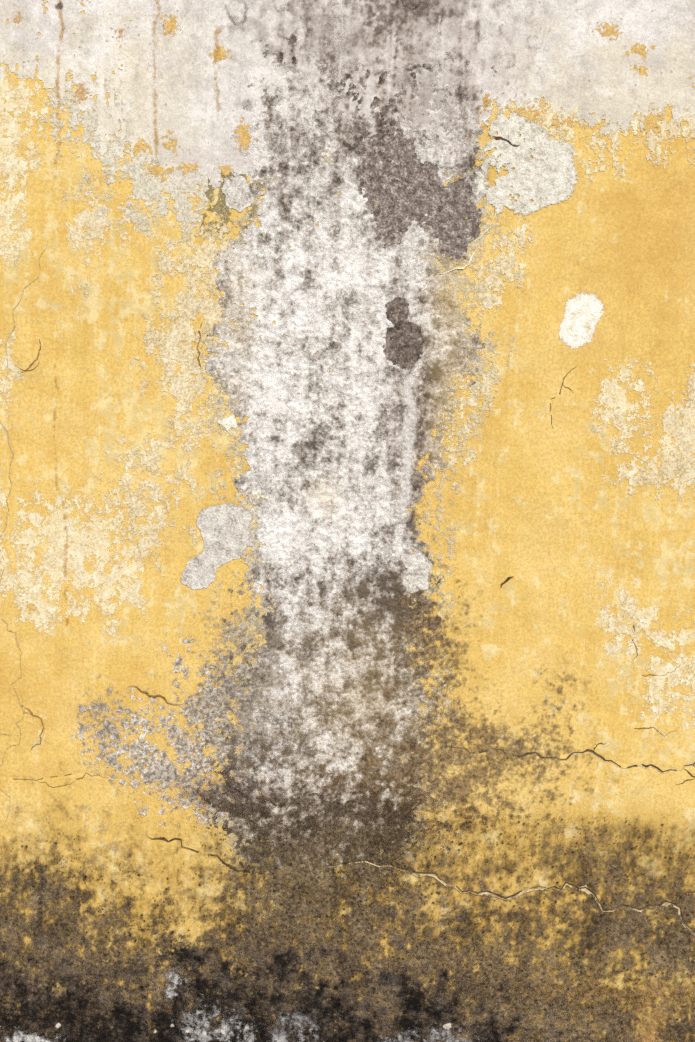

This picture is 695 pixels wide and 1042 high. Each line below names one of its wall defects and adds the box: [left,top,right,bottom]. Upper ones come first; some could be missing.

leakage [361,0,453,45]
spalling [382,297,424,370]
peeling [559,291,604,349]
leakage [393,372,428,530]
peeling [180,503,255,590]
peeling [401,552,441,593]
crack [0,619,104,826]
peeling [74,697,233,823]
crack [437,743,695,785]
crack [149,837,251,873]
leakage [0,783,695,1042]
crack [323,860,695,968]